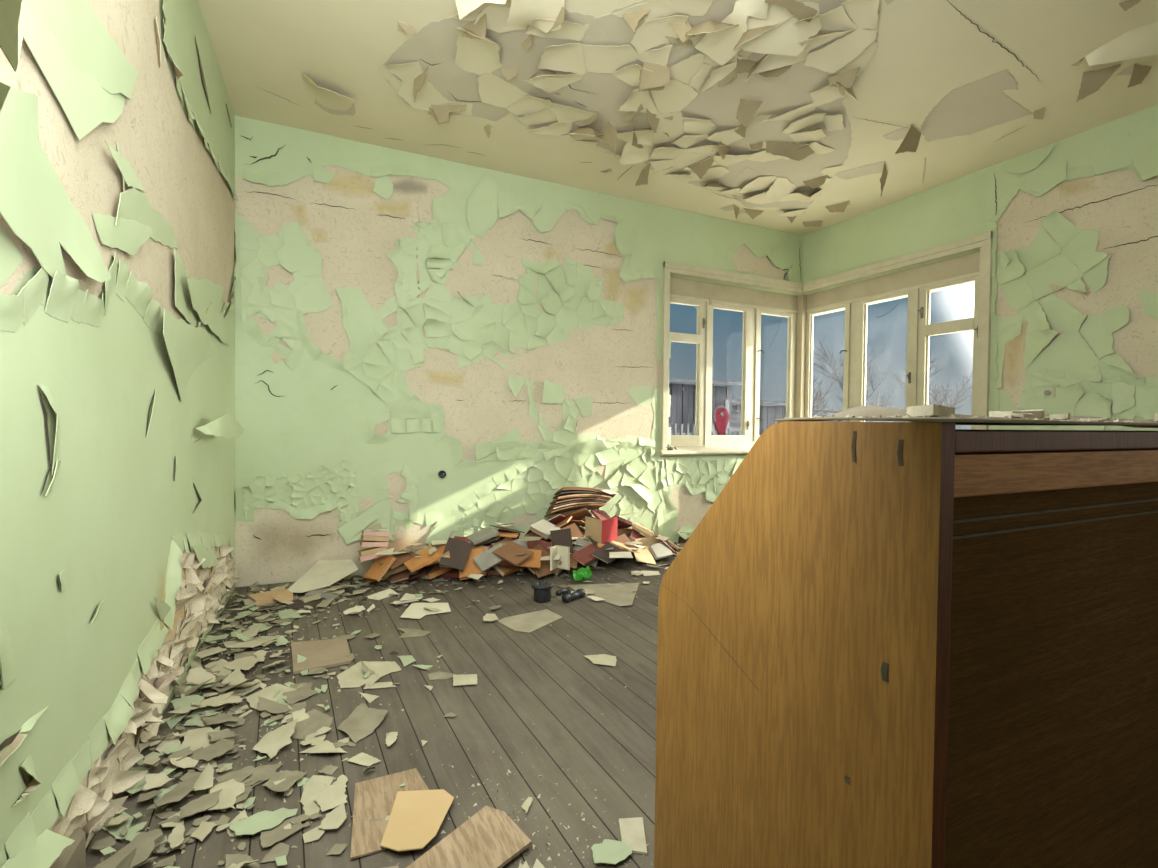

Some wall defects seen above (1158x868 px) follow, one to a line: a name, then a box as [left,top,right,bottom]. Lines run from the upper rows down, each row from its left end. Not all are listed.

peeling [379,0,1045,227]
peeling [1070,21,1158,102]
peeling [0,0,671,469]
peeling [726,235,797,291]
peeling [986,129,1158,430]
peeling [39,385,62,496]
peeling [662,475,730,541]
peeling [0,460,485,868]
peeling [591,839,632,865]